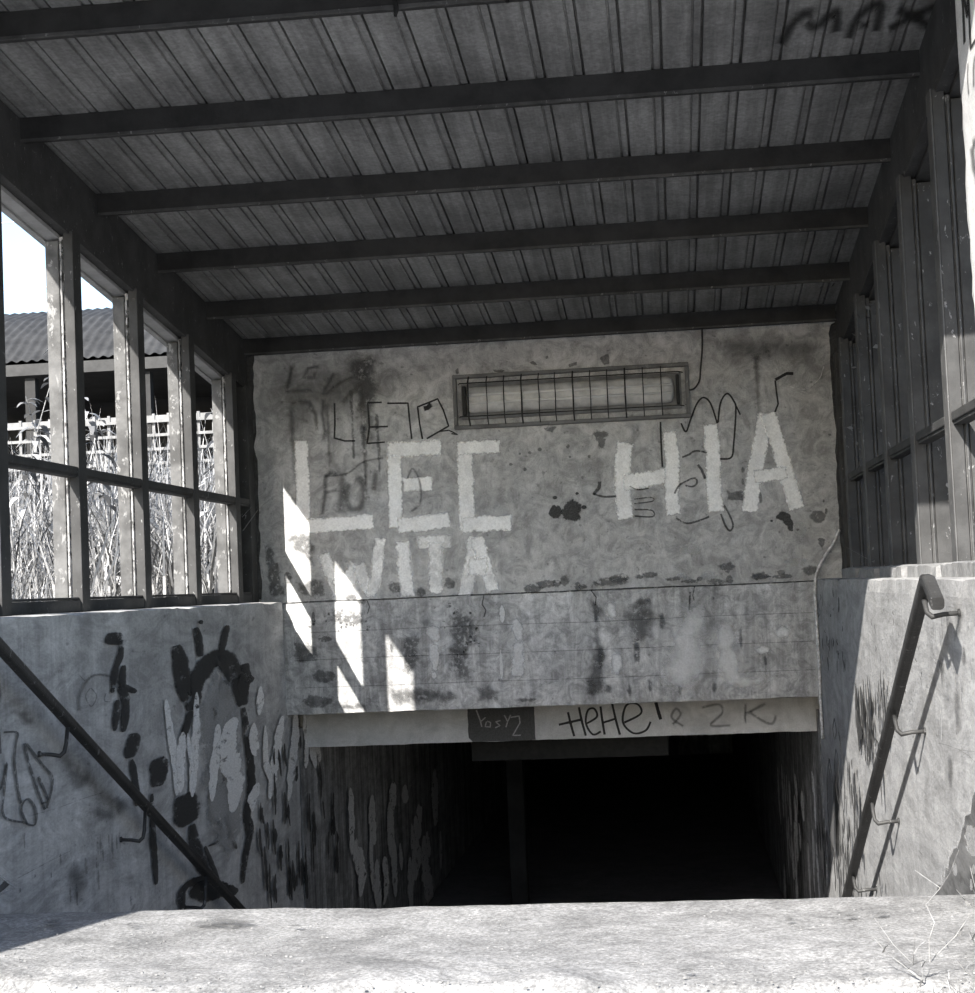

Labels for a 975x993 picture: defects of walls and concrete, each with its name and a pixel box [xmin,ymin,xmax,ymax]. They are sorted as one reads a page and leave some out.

leakage [393,689,454,702]
leakage [427,626,440,679]
leakage [480,687,497,699]
leakage [499,605,524,679]
leakage [593,604,615,621]
leakage [587,638,622,694]
leakage [627,600,664,662]
leakage [666,614,702,693]
leakage [719,629,760,686]
spalling [935,792,975,895]